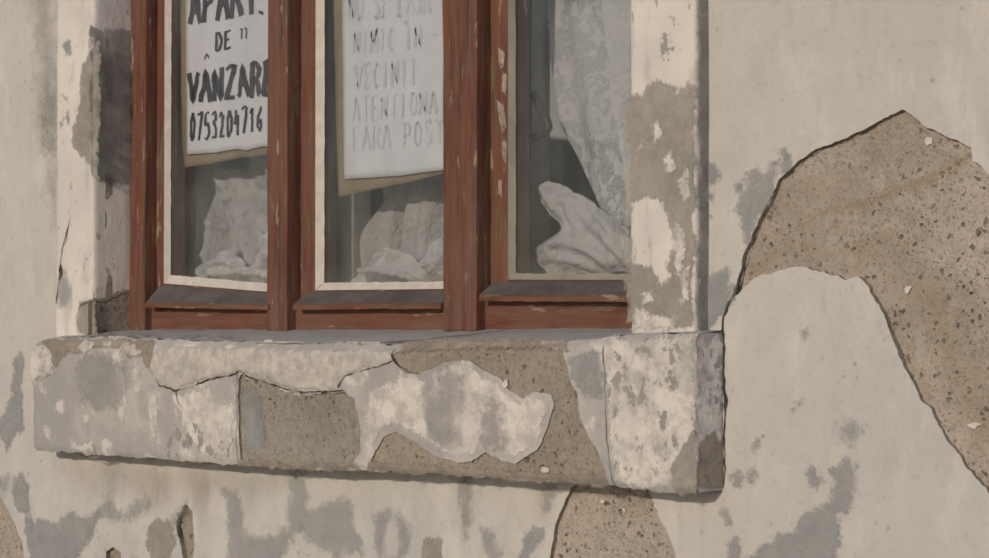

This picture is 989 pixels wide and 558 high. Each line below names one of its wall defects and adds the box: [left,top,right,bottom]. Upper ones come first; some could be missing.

peeling [59,25,131,185]
crack [56,220,70,305]
flaking render [366,0,989,558]
flaking render [42,290,165,426]
crack [156,330,505,460]
peeling [0,473,149,558]
peeling [145,506,194,558]
flaking render [166,375,361,558]